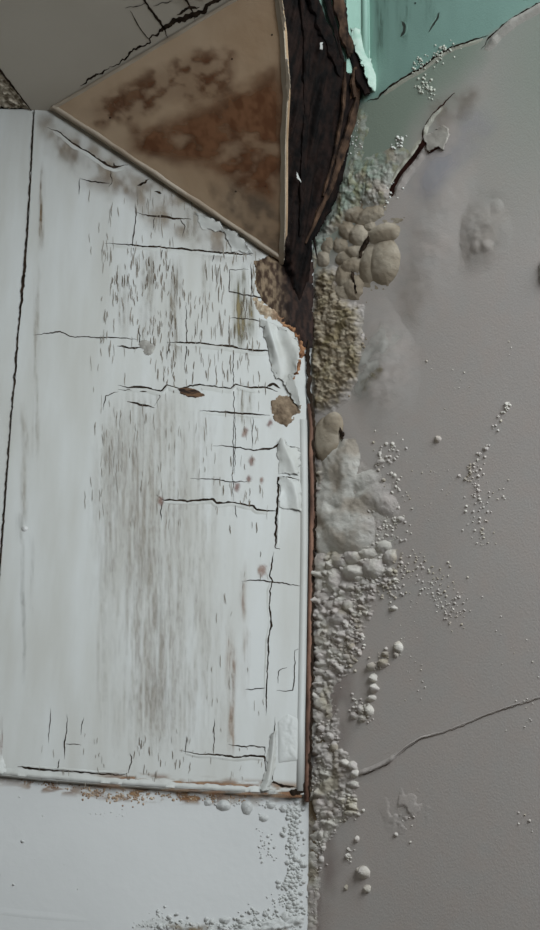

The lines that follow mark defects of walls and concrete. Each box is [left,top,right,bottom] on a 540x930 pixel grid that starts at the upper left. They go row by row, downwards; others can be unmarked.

crack [80,0,221,86]
crack [368,2,540,197]
spalling [312,108,409,269]
damp [234,277,253,341]
peeling [260,319,302,427]
crack [0,69,299,788]
peeling [276,438,302,512]
crack [358,696,540,776]